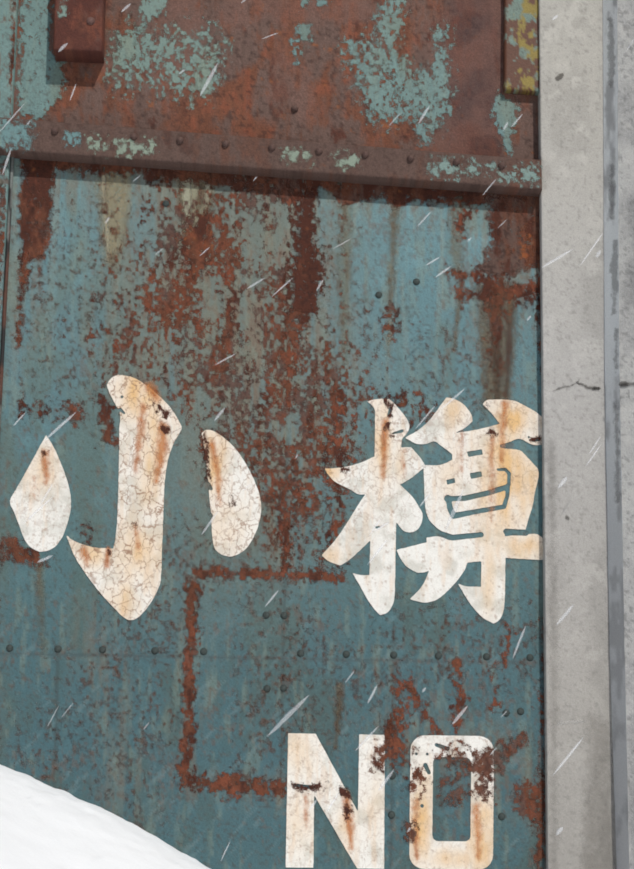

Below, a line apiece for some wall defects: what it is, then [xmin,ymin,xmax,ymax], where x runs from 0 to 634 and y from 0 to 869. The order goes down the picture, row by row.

corrosion [4,1,16,118]
peeling [288,0,332,65]
peeling [335,0,546,188]
peeling [62,131,157,160]
peeling [280,146,315,165]
peeling [328,149,360,172]
crack [557,381,634,390]
corrosion [0,157,546,869]